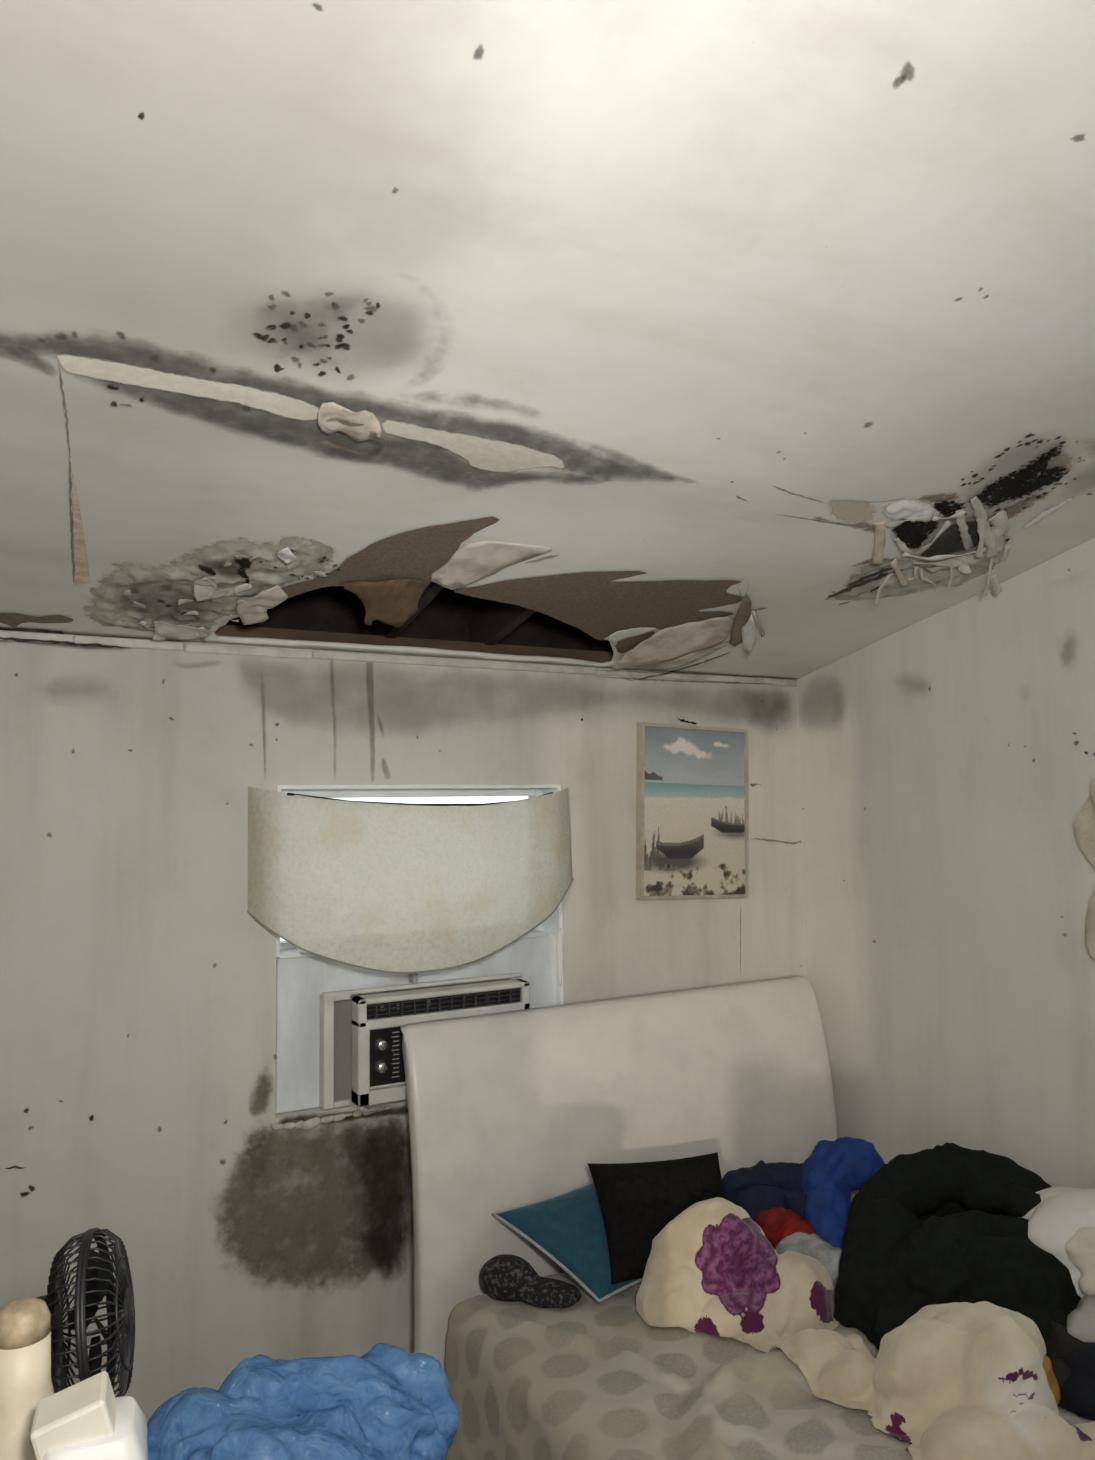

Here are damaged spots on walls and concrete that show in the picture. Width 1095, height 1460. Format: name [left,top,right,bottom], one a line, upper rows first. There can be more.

leakage [0,292,655,487]
leakage [215,562,238,576]
flaking render [277,547,297,565]
mould [218,1119,409,1285]